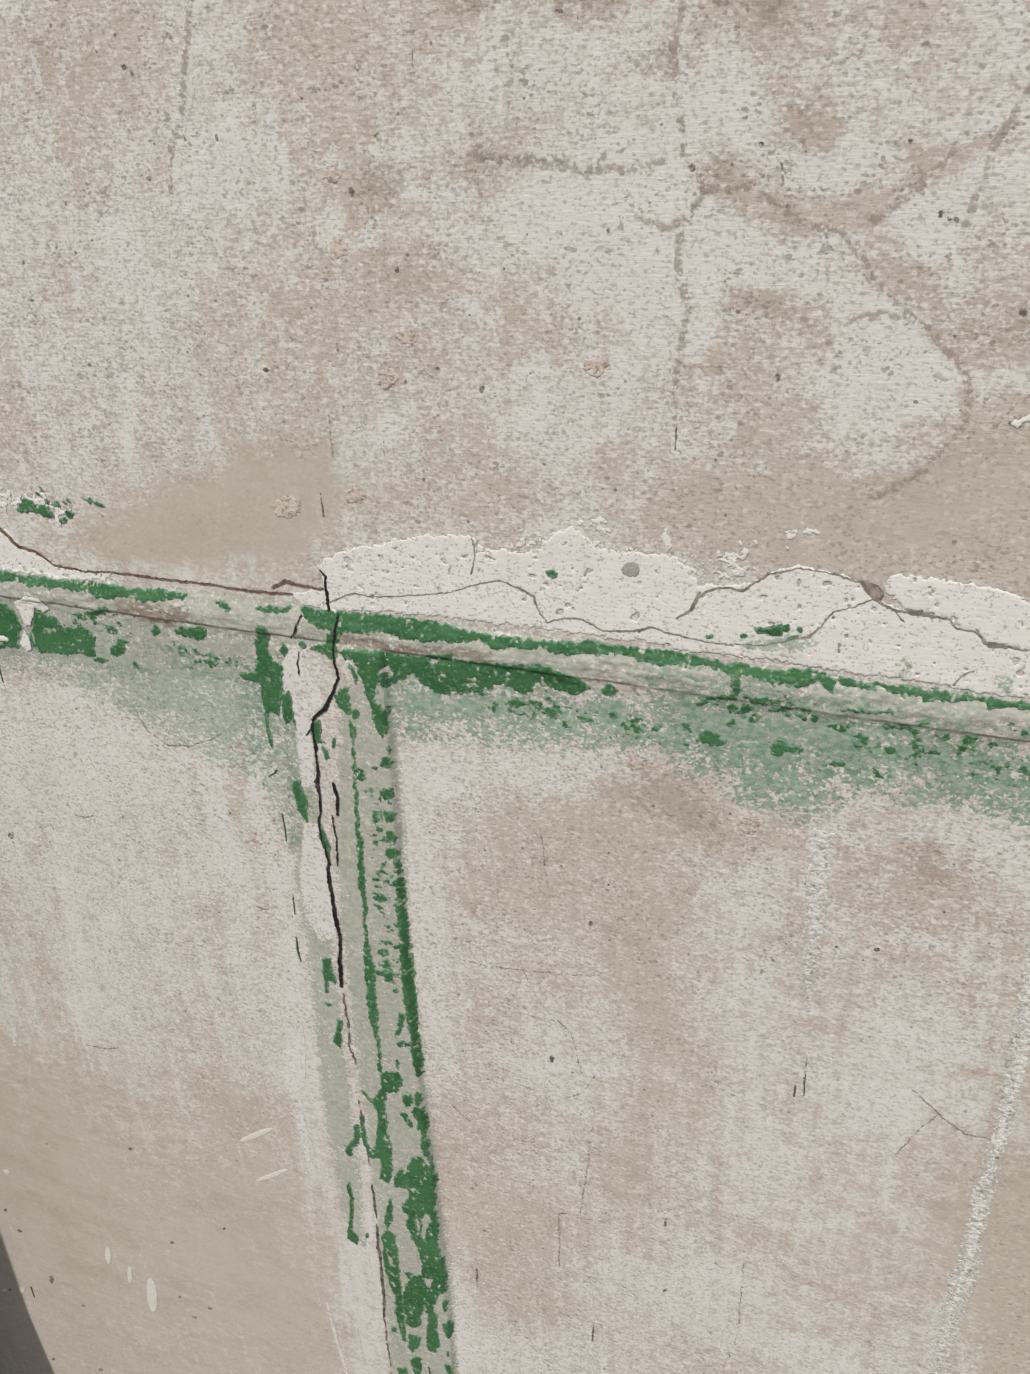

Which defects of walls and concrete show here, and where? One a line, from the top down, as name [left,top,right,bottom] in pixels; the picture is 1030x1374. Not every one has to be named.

peeling [0,477,188,669]
flaking render [1008,414,1030,428]
crack [0,527,1030,1065]
flaking render [150,511,1030,1374]
crack [358,1100,391,1373]
crack [463,960,687,1298]
crack [895,939,1030,1374]